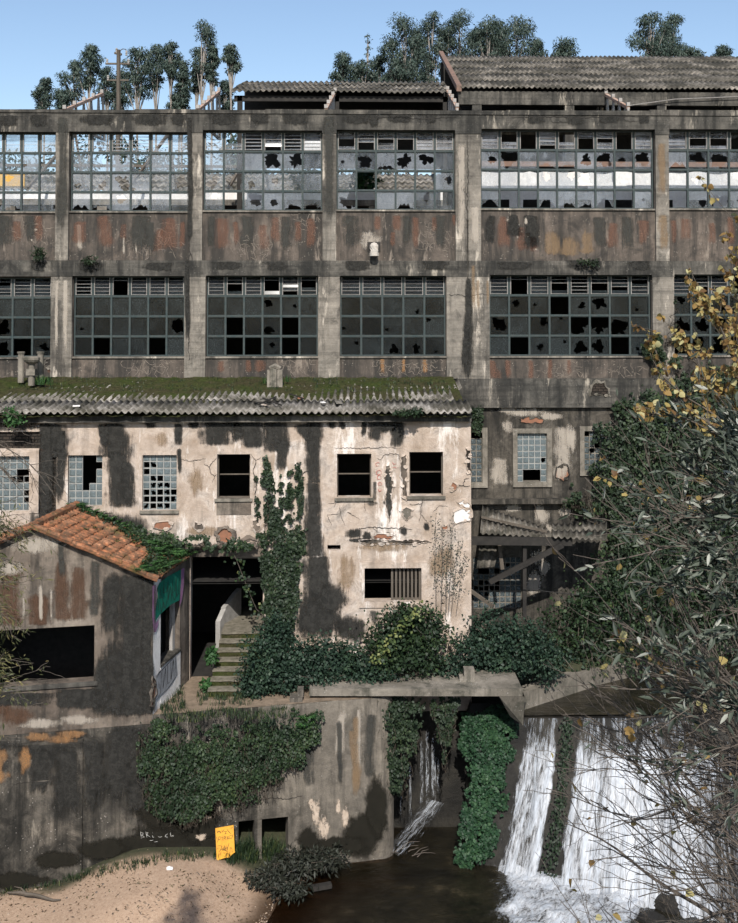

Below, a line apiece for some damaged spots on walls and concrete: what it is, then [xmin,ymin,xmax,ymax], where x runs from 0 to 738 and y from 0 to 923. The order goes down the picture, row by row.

damp [458,144,495,244]
damp [0,423,69,522]
damp [98,423,147,529]
damp [145,422,377,644]
peeling [440,481,473,532]
peeling [464,446,472,476]
peeling [491,459,508,483]
peeling [501,408,576,483]
damp [0,538,219,891]
spalling [309,799,330,839]
damp [297,710,388,858]
spalling [336,801,349,827]